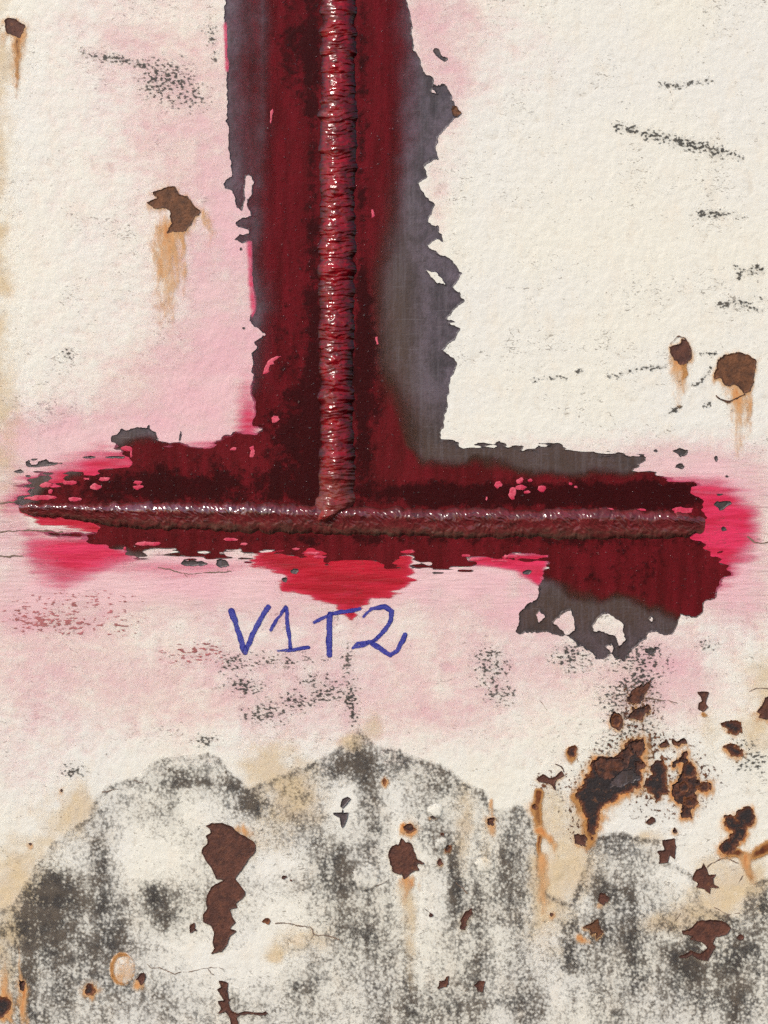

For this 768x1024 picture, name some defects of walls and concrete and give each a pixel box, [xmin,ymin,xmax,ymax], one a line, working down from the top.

rust [147,186,209,305]
rust [669,335,692,392]
rust [713,352,756,424]
rust [529,680,722,926]
rust [721,720,743,760]
mould [0,786,210,1024]
rust [189,823,256,954]
mould [150,733,550,1024]
rust [388,822,433,921]
mould [546,833,768,1024]
rust [648,806,768,961]
rust [217,981,268,1024]